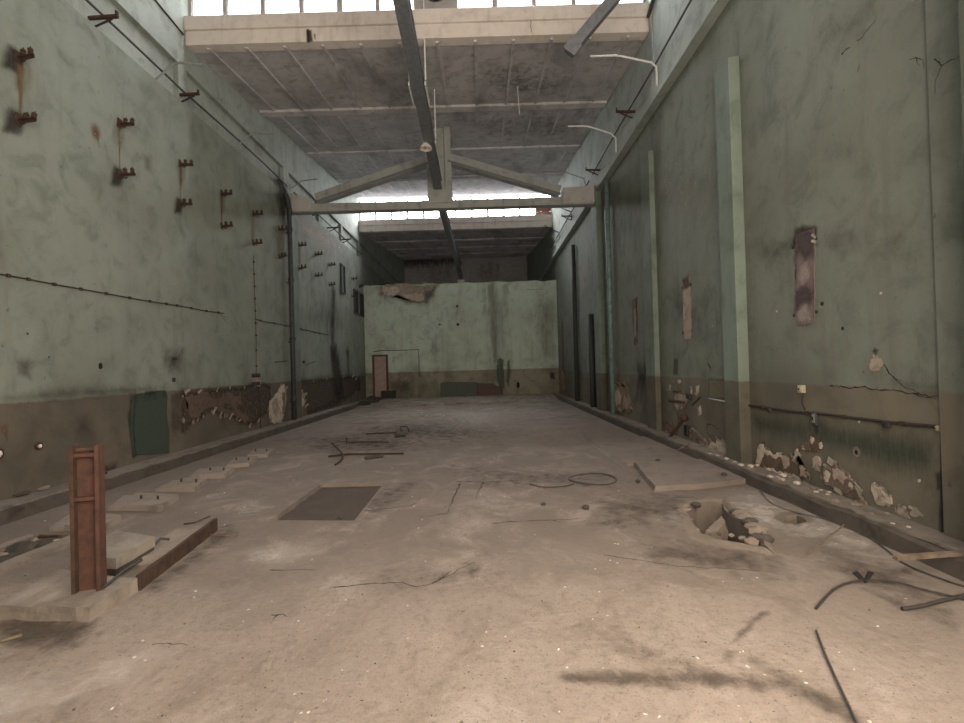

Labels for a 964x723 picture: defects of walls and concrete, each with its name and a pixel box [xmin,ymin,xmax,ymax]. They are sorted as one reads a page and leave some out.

peeling [380,282,435,303]
peeling [182,377,288,432]
peeling [301,374,360,414]
peeling [669,380,702,416]
crack [830,365,936,399]
peeling [755,436,924,519]